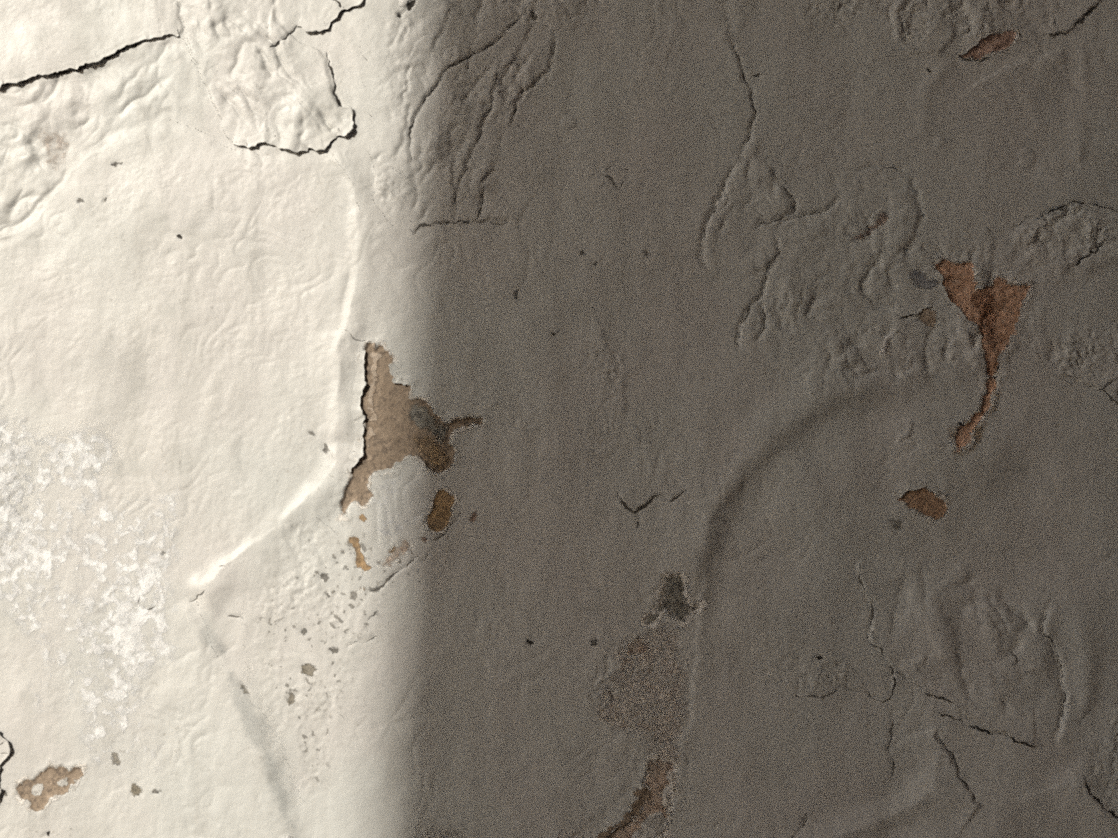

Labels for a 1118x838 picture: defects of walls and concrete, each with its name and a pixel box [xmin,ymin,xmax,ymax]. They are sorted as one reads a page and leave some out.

peeling [957,26,1019,60]
spalling [0,0,200,239]
peeling [233,106,354,153]
spalling [739,166,1118,452]
crack [1065,374,1118,404]
crack [615,490,686,528]
peeling [891,478,950,521]
peeling [553,571,708,838]
crack [794,559,1035,806]
peeling [0,735,11,769]
peeling [0,761,87,812]
crack [1086,781,1118,818]